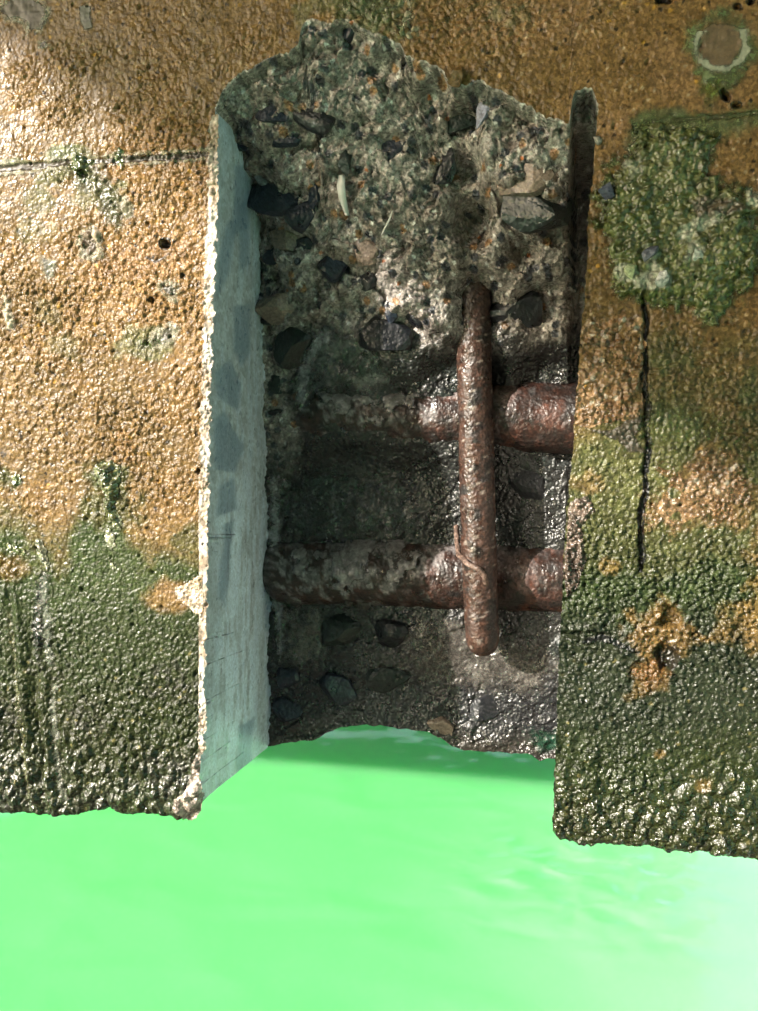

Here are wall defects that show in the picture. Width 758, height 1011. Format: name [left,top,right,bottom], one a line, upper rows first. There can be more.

spalling [172,18,599,820]
crack [637,301,652,572]
damp [32,538,53,663]
damp [14,673,30,797]
damp [49,684,59,736]
damp [55,748,67,799]